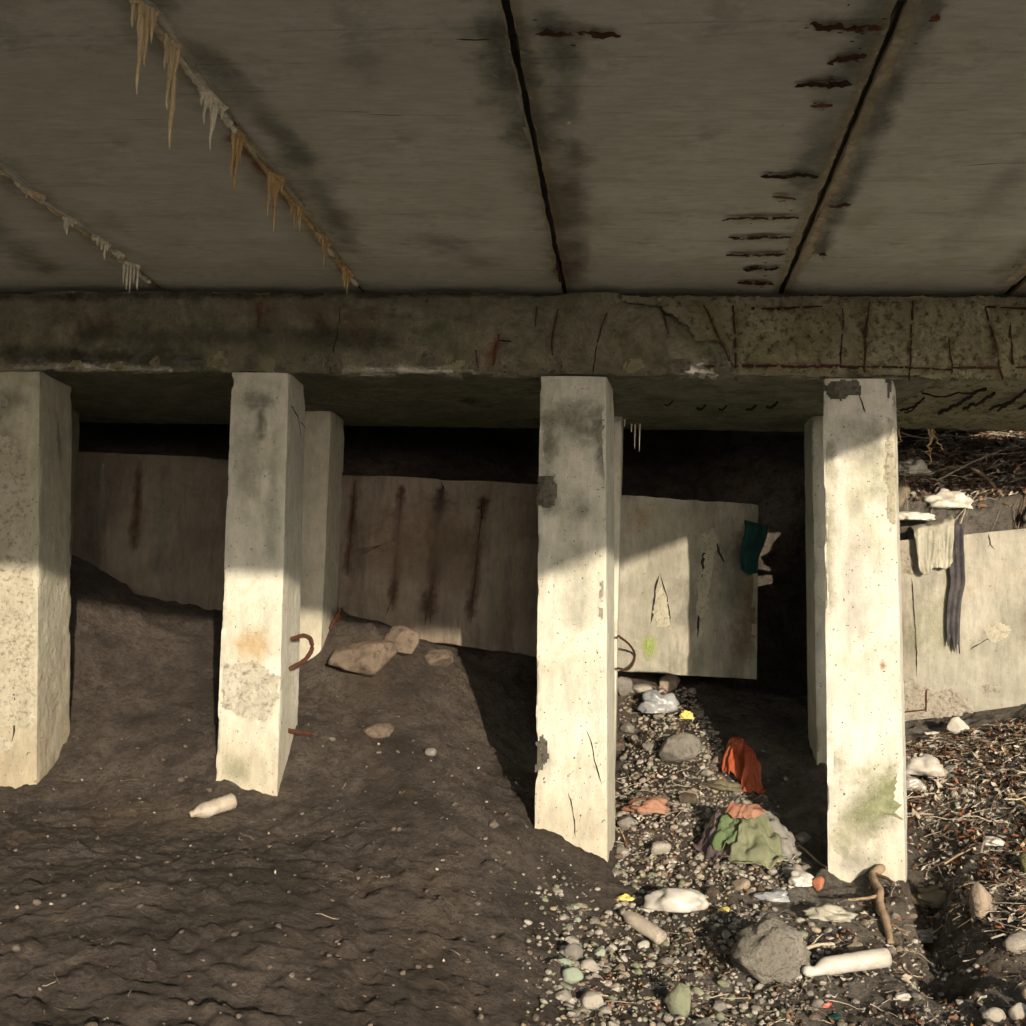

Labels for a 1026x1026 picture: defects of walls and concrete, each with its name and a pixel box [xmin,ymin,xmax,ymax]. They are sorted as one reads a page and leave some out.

damp [481,22,533,93]
corrosion [534,19,621,50]
corrosion [795,18,888,89]
damp [142,0,391,299]
corrosion [722,196,799,240]
corrosion [726,253,786,291]
spalling [622,295,1026,532]
corrosion [345,477,357,575]
corrosion [423,481,447,627]
corrosion [467,497,488,625]
crack [650,528,725,638]
spalling [904,679,975,720]